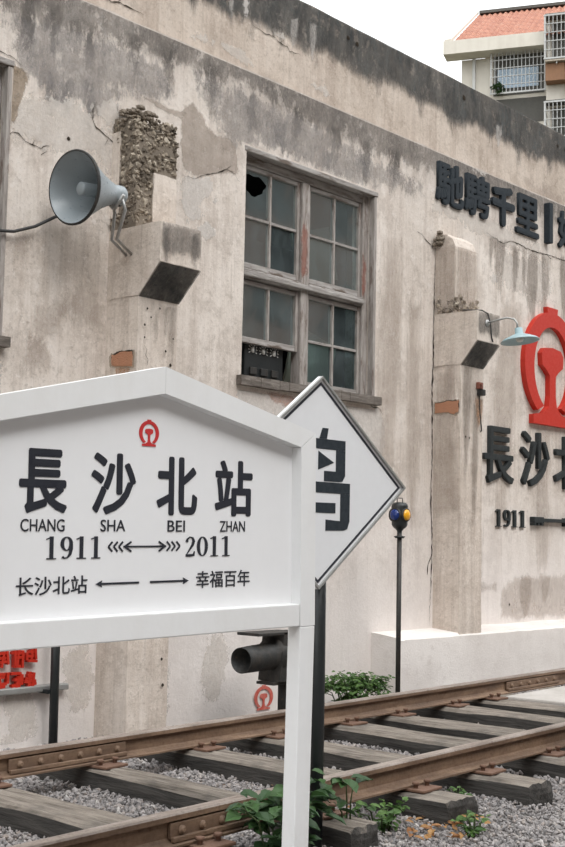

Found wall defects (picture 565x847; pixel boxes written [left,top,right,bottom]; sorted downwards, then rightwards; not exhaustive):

water stain [9,0,565,217]
crack [486,232,565,261]
water stain [139,224,201,304]
flaking render [109,349,135,368]
flaking render [434,399,459,416]